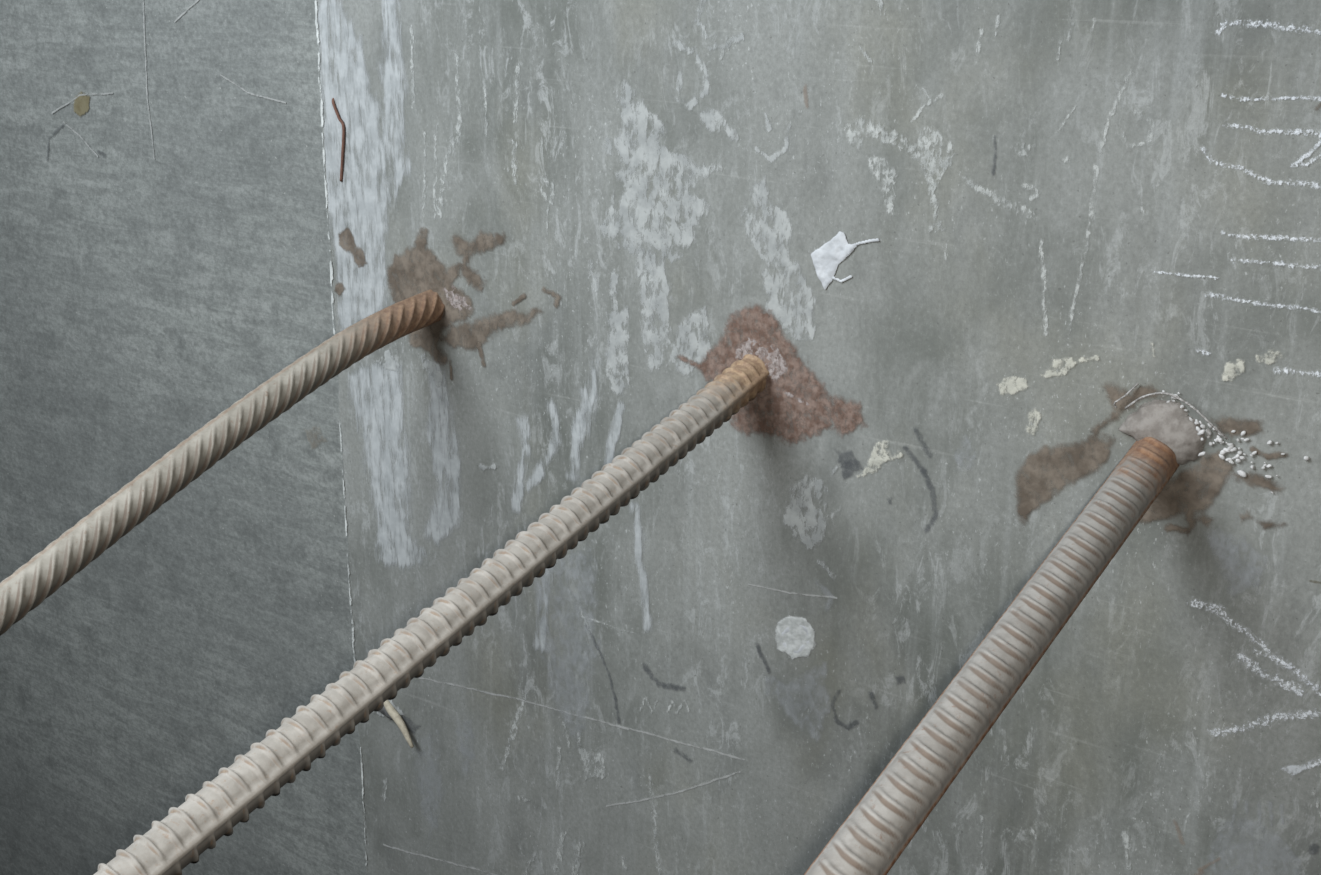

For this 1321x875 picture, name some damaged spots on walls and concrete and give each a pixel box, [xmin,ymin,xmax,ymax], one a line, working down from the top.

rust [339,228,366,267]
rust [388,228,560,380]
rust [679,305,863,443]
rust [1016,385,1157,521]
rust [1140,451,1279,533]
rust [1216,418,1287,460]